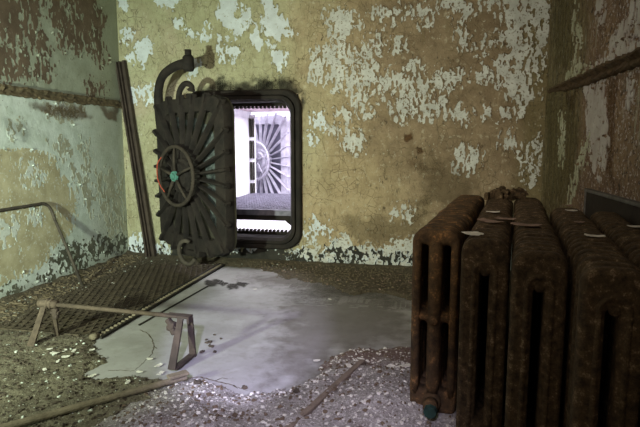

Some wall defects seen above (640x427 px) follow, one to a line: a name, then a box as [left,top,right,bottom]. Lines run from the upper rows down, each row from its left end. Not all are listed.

peeling [0,0,112,99]
peeling [116,0,130,14]
peeling [119,26,155,70]
peeling [153,0,299,81]
peeling [565,0,640,81]
peeling [303,0,552,189]
peeling [625,70,640,112]
peeling [557,109,566,170]
peeling [563,79,611,211]
peeling [0,116,145,296]
spalling [155,235,188,256]
spalling [215,196,418,266]